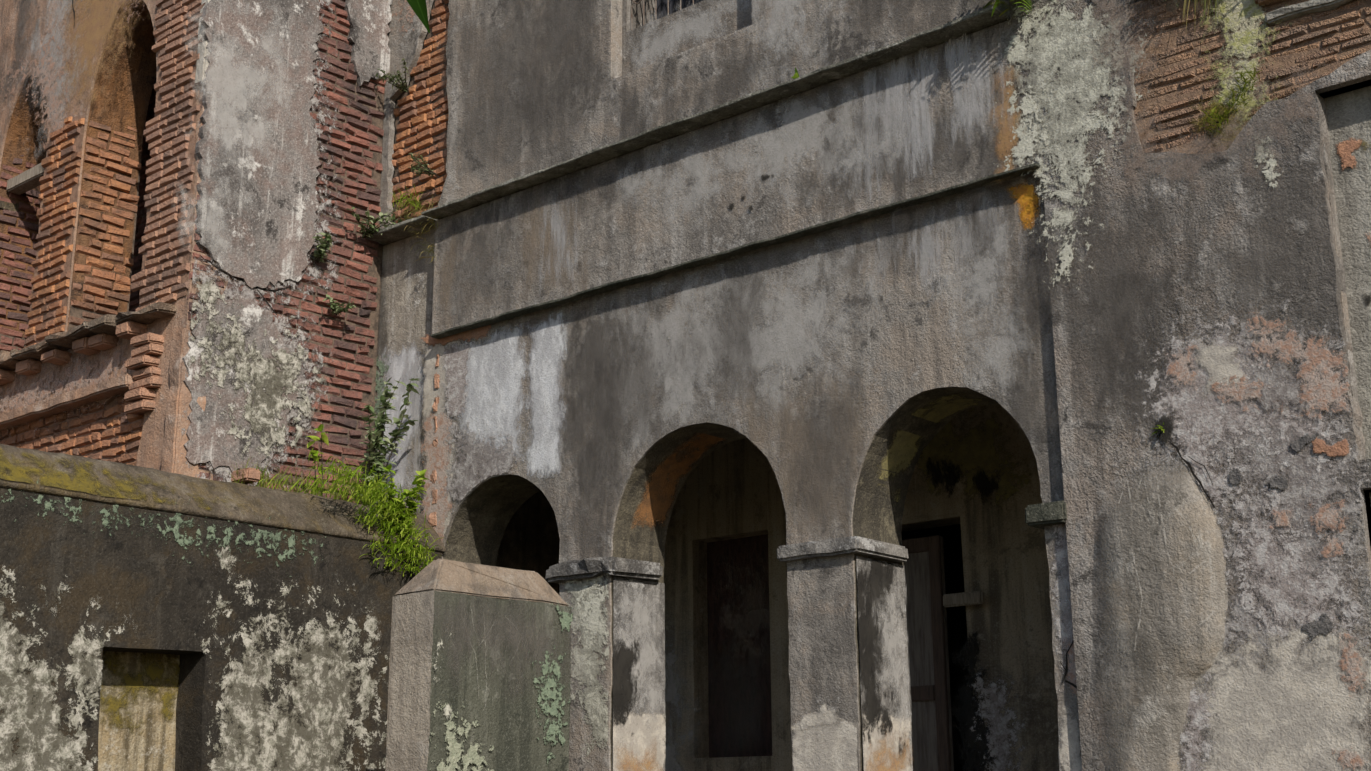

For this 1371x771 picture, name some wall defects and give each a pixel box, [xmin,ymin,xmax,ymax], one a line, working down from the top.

flaking render [391,0,450,224]
damp [621,0,808,139]
damp [544,39,1017,304]
spalling [1091,0,1371,154]
damp [564,245,828,555]
crack [1168,441,1215,508]
peeling [1129,295,1371,771]